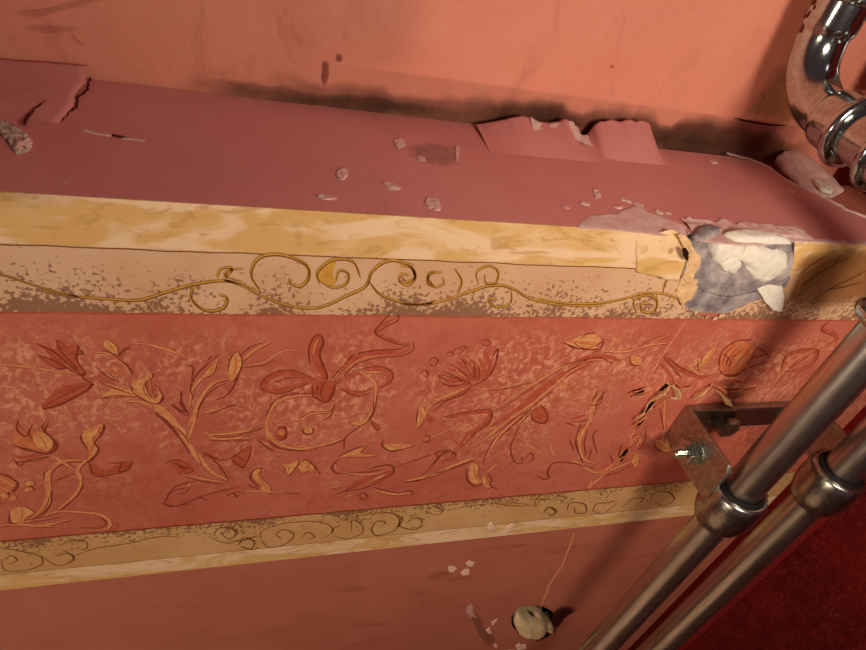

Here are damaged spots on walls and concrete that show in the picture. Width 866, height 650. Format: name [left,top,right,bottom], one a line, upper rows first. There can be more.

crack [22,101,45,126]
peeling [0,58,92,155]
damp [535,109,555,122]
peeling [476,116,619,165]
flaking render [774,149,844,198]
flaking render [577,188,866,313]
spalling [494,602,560,650]